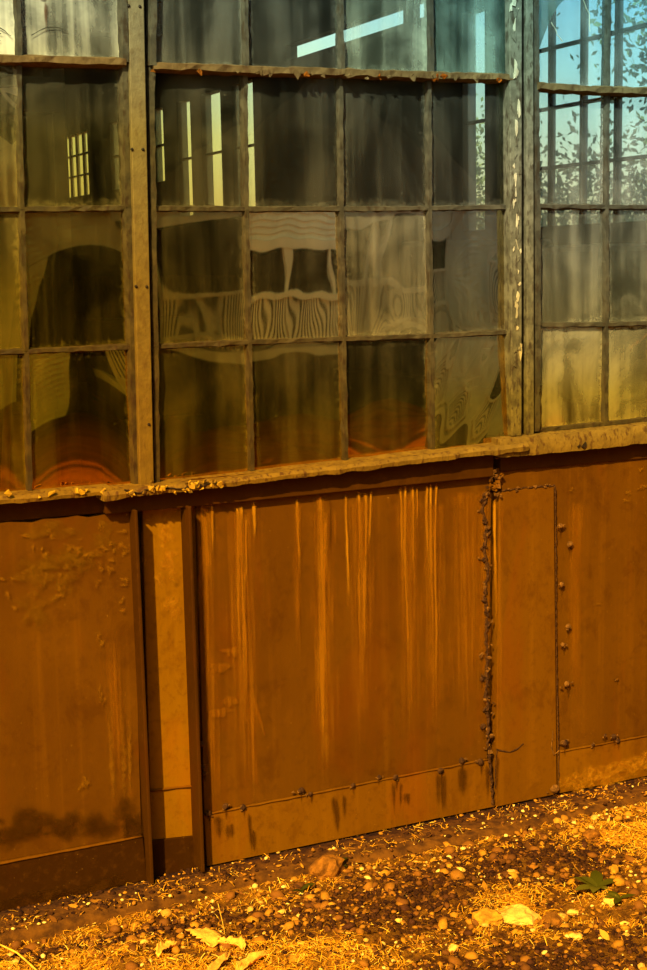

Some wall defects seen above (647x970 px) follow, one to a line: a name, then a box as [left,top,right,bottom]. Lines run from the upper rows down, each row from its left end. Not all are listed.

corrosion [203,505,213,599]
corrosion [228,502,257,765]
corrosion [318,498,332,730]
corrosion [345,493,372,673]
corrosion [399,484,437,682]
corrosion [459,457,574,805]
water stain [0,799,142,846]